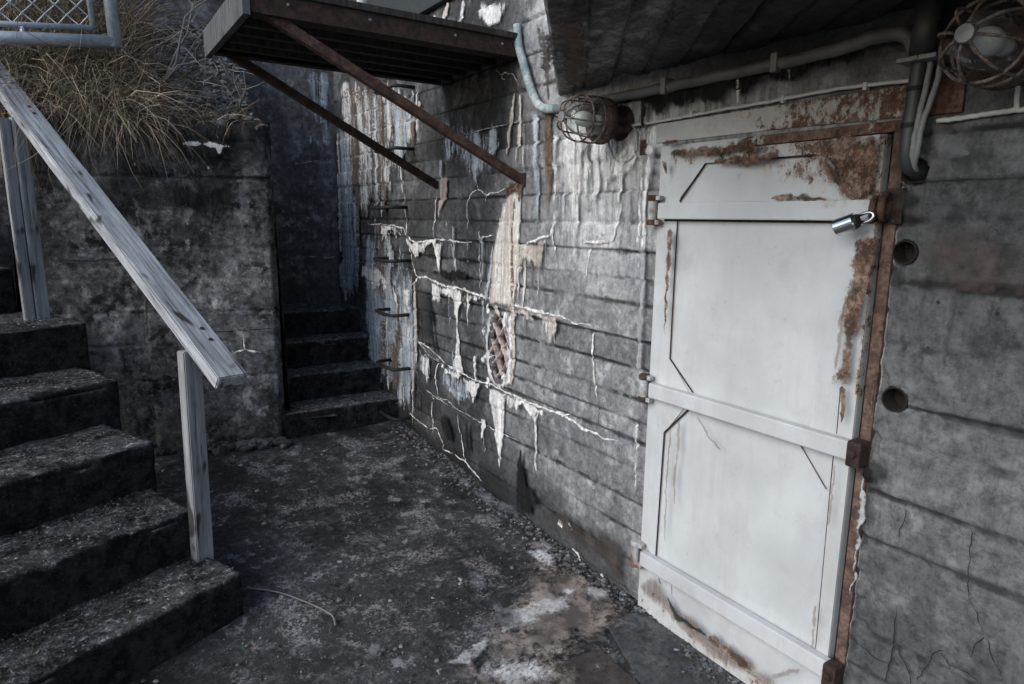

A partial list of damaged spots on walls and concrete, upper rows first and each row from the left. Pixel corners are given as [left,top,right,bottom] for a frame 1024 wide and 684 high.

leakage [552,117,647,285]
rust [662,139,778,174]
rust [771,193,826,201]
rust [811,133,881,200]
leakage [341,81,557,516]
spalling [481,304,510,394]
rust [664,229,673,333]
rust [833,237,878,422]
rust [641,579,799,684]
crack [848,532,1001,684]